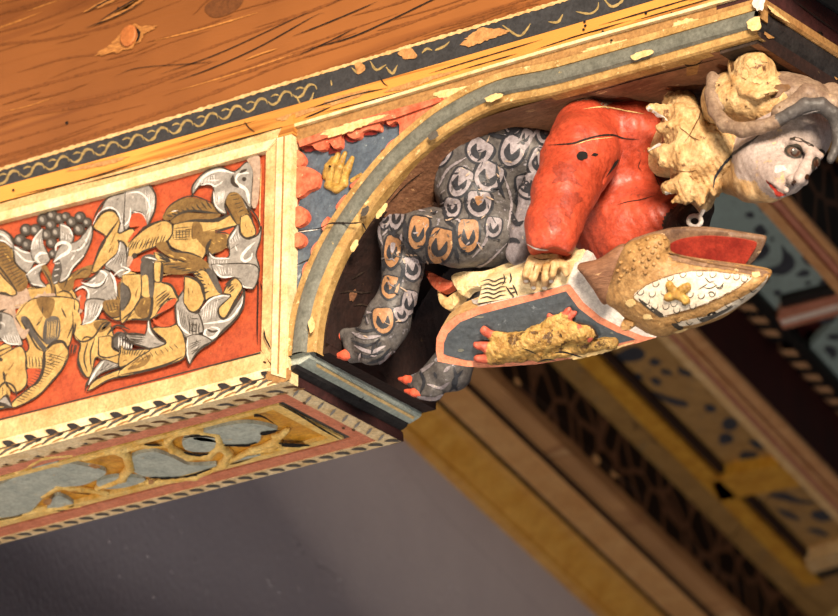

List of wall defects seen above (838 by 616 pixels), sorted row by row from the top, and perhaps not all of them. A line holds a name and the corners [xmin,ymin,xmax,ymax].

crack [86,0,142,28]
peeling [747,0,790,39]
peeling [460,27,509,47]
peeling [398,48,417,59]
crack [299,222,366,231]